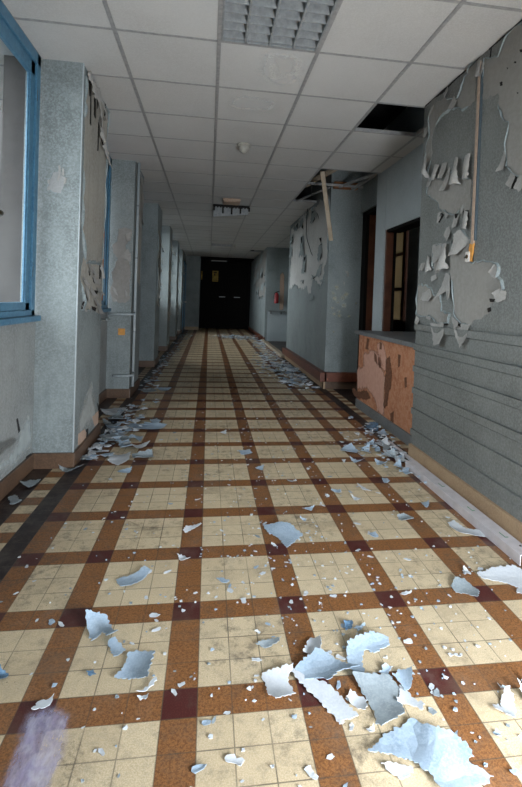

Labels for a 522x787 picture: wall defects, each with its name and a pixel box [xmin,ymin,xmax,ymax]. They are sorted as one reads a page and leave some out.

peeling [80,72,145,315]
peeling [289,194,330,301]
peeling [415,23,522,347]
peeling [353,338,401,435]